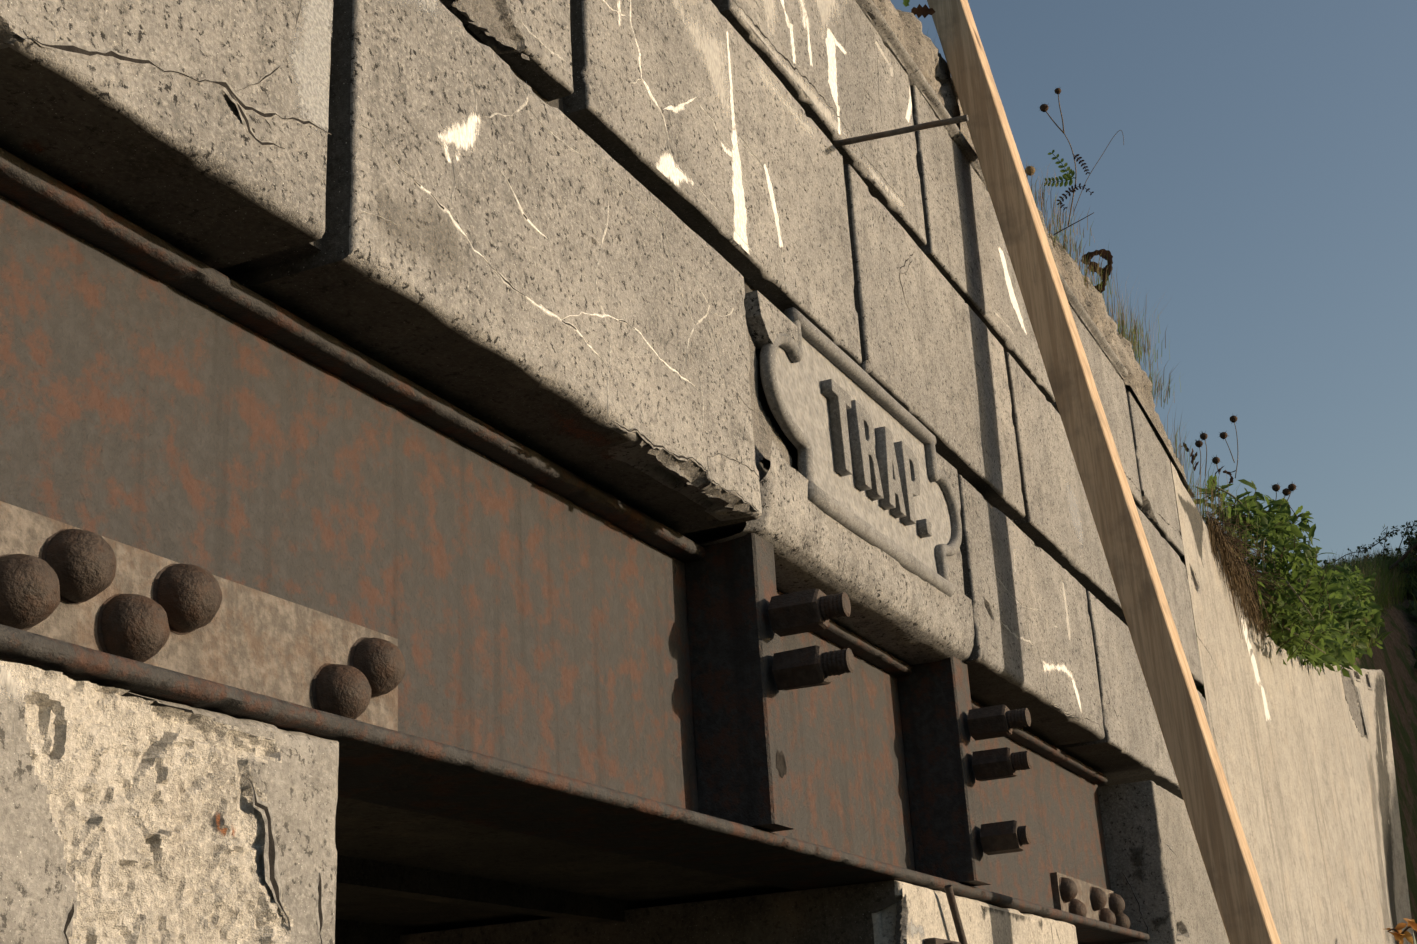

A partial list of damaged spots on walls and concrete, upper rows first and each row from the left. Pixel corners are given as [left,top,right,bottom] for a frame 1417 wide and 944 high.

spalling [409,0,533,60]
crack [519,20,565,62]
damp [741,0,847,135]
crack [603,0,786,287]
damp [764,164,783,248]
damp [869,167,903,206]
crack [17,37,759,511]
spalling [0,661,298,944]